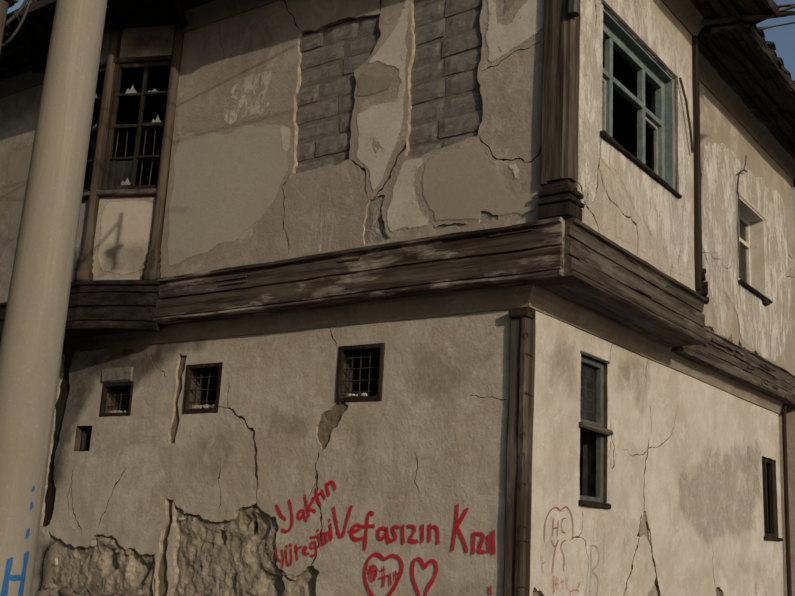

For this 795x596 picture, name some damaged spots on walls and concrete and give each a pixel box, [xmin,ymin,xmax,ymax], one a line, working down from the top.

peeling [485,0,544,62]
peeling [357,0,468,246]
flaking render [479,211,499,224]
crack [578,138,638,255]
peeling [702,142,791,361]
spalling [40,354,319,596]
crack [220,386,259,499]
crack [307,452,323,572]
flaking render [316,403,349,452]
crack [609,408,677,596]